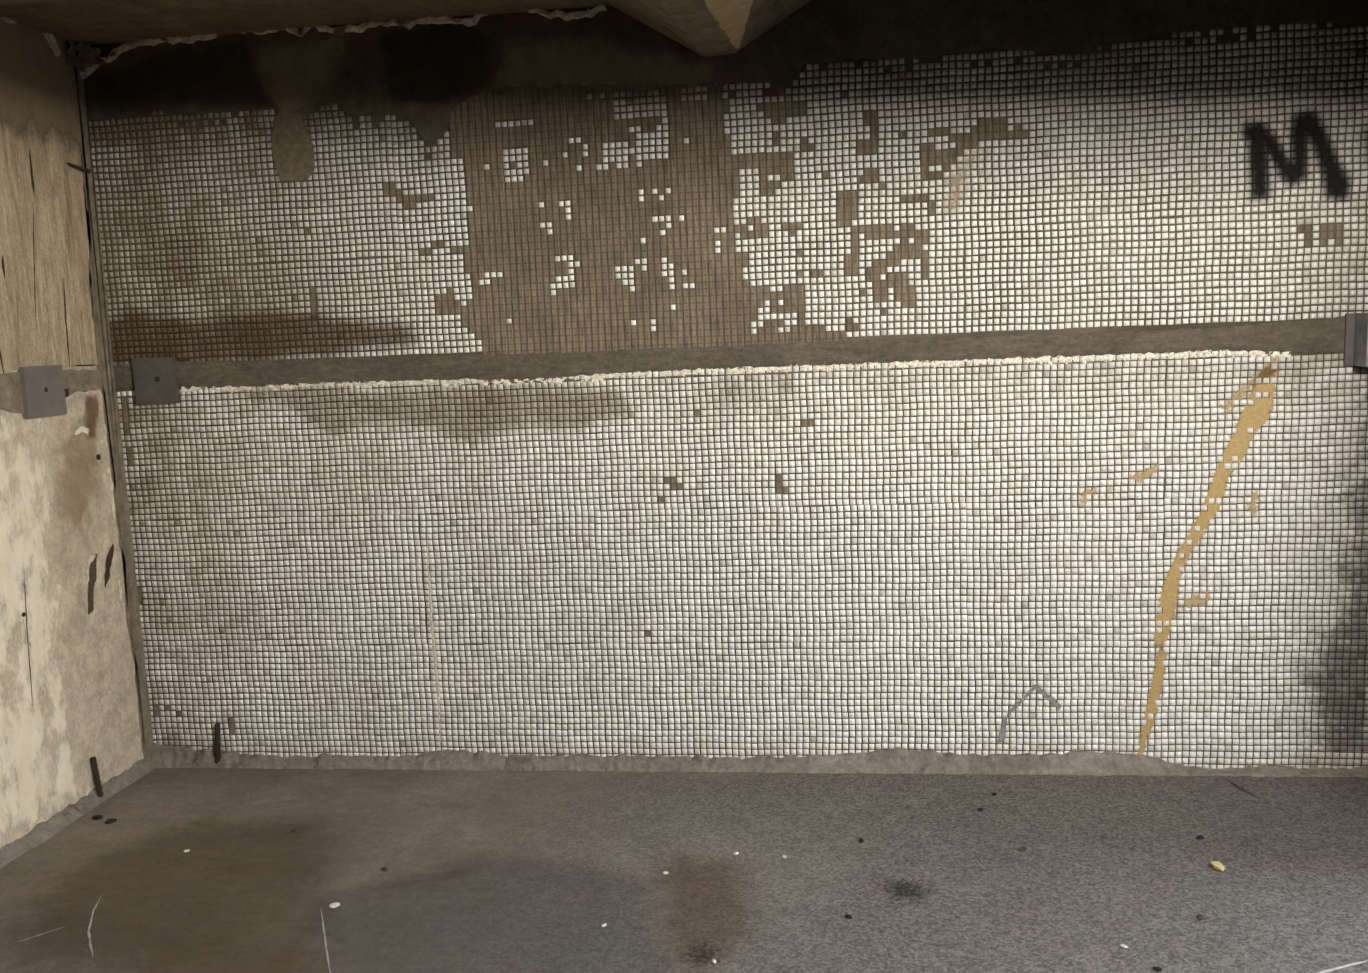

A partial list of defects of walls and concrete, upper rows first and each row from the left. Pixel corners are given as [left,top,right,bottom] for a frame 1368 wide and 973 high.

spalling [241,14,488,37]
spalling [528,4,607,21]
spalling [43,33,218,79]
peeling [419,85,860,355]
peeling [822,110,1029,316]
leakage [109,315,412,362]